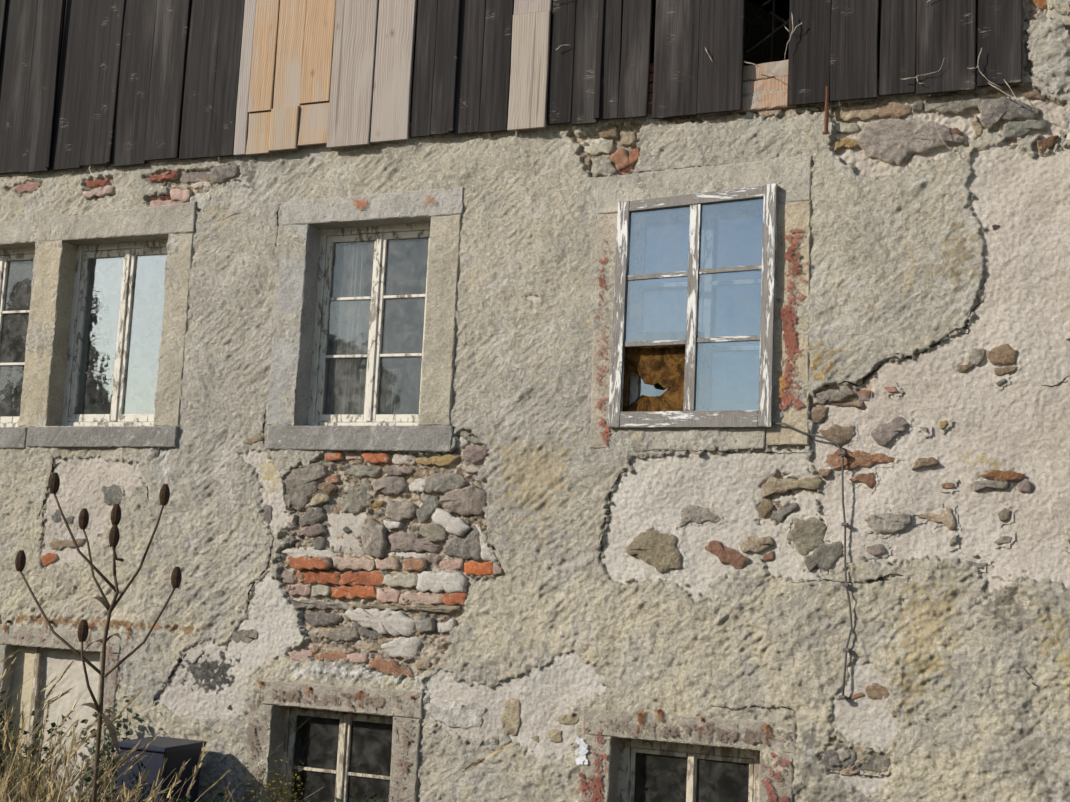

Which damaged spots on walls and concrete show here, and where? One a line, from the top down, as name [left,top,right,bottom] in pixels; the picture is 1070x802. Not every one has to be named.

spalling [8,180,42,196]
spalling [82,177,116,200]
spalling [144,165,241,212]
peeling [599,0,1070,602]
crack [822,279,986,387]
crack [38,456,61,551]
crack [245,528,274,614]
spalling [156,430,791,802]
leakage [177,651,241,694]